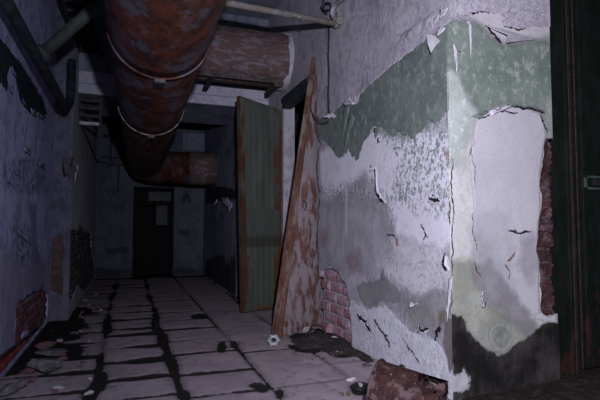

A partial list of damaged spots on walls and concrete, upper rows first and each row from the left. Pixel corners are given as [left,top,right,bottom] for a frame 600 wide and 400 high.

peeling [0,39,47,120]
flaking render [317,0,557,356]
spalling [0,222,94,374]
peeling [322,267,454,400]
crack [355,313,421,370]
leakage [357,263,560,400]